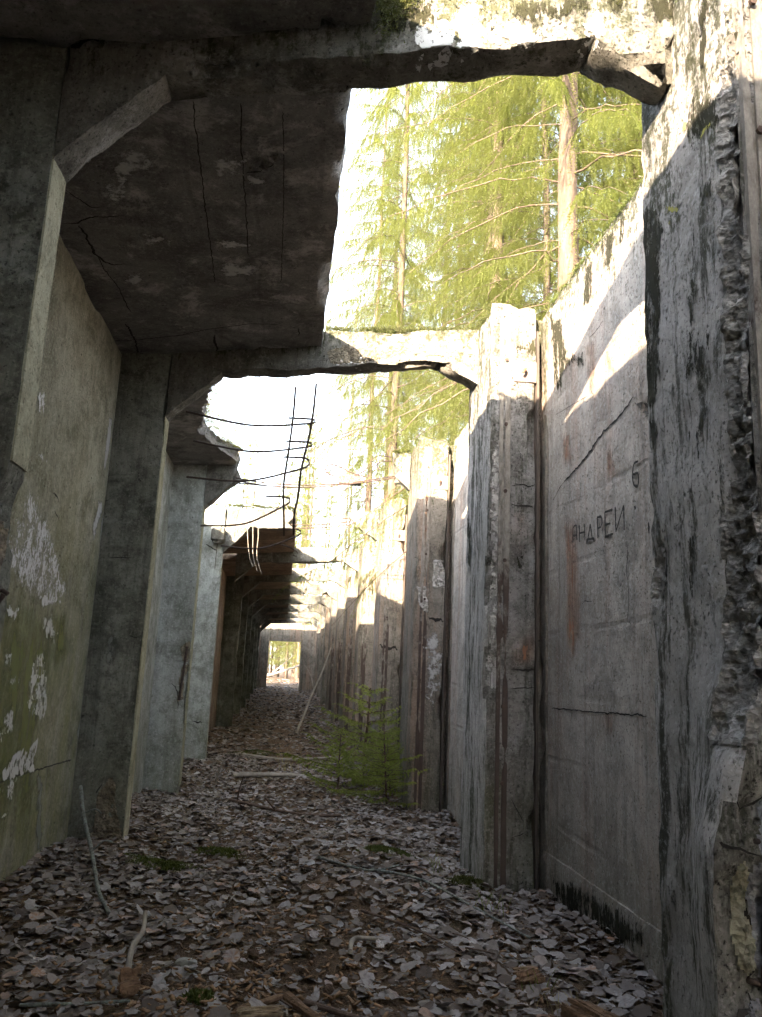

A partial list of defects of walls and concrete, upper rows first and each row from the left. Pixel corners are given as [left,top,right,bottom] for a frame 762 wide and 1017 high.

peeling [415,5,539,71]
peeling [577,13,609,58]
damp [562,351,584,369]
spalling [707,64,762,747]
peeling [0,490,66,643]
peeling [27,654,47,719]
peeling [0,709,13,742]
peeling [2,738,38,800]
spalling [737,801,762,1017]